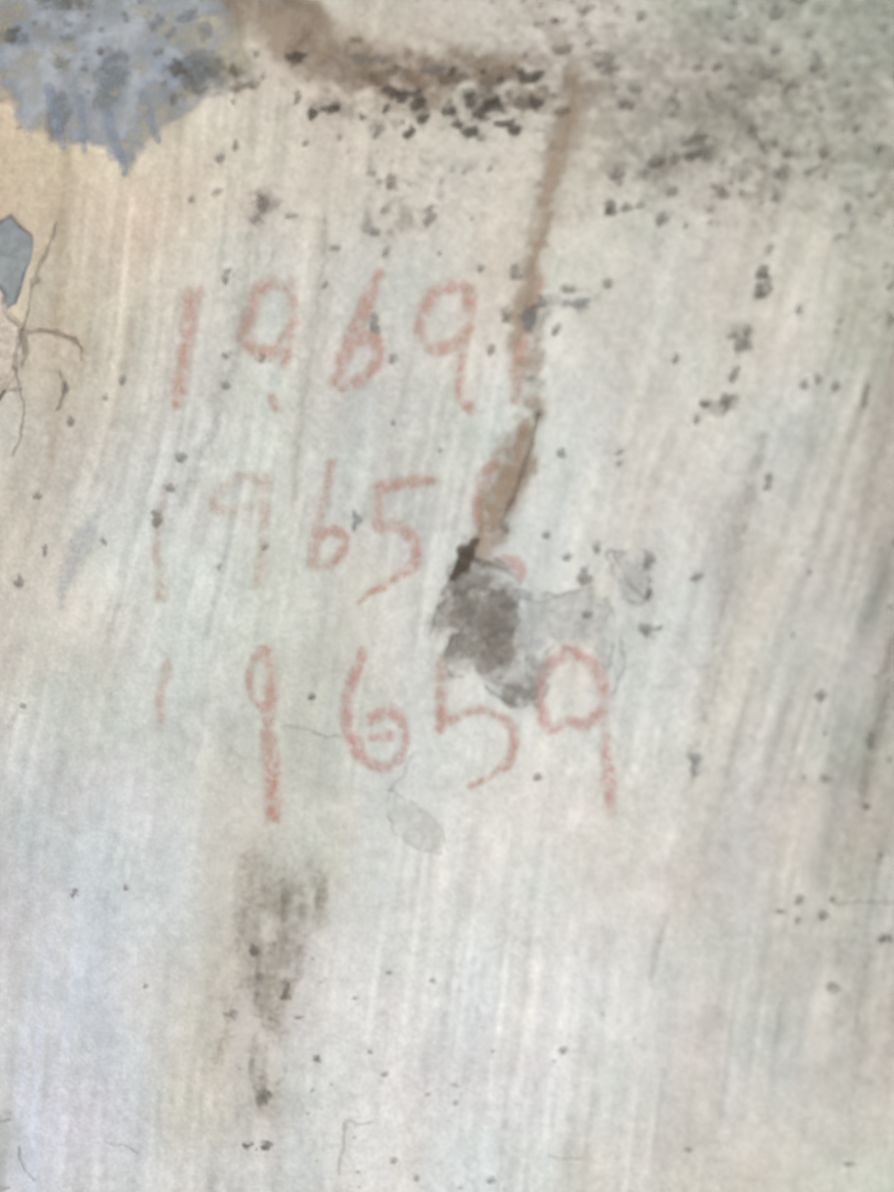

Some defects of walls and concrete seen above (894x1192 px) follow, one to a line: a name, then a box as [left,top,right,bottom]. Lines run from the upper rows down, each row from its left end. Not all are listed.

peeling [0,0,251,174]
damp [225,0,556,139]
peeling [0,216,33,397]
corrosion [477,396,541,558]
peeling [433,538,546,705]